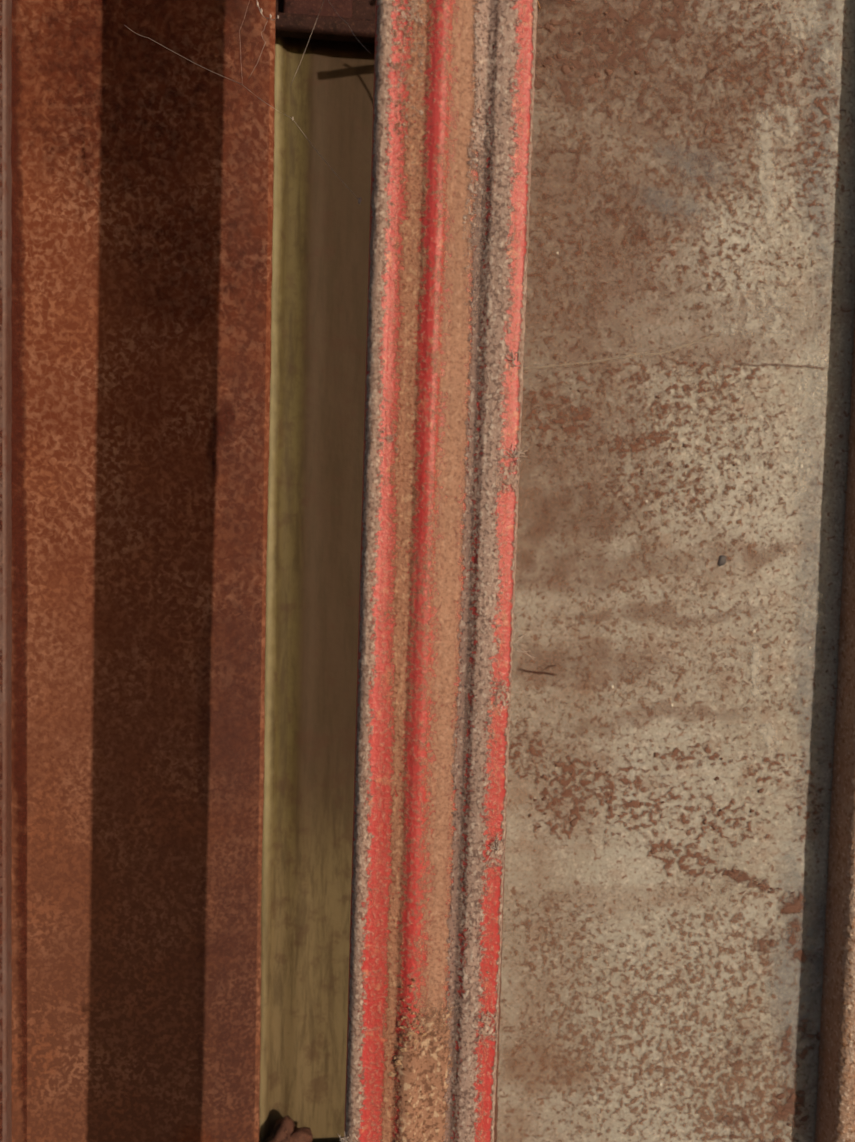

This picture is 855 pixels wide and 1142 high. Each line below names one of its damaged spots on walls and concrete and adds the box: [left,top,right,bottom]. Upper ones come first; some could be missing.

peeling [345,0,426,1142]
peeling [449,0,537,1142]
corrosion [498,0,848,1142]